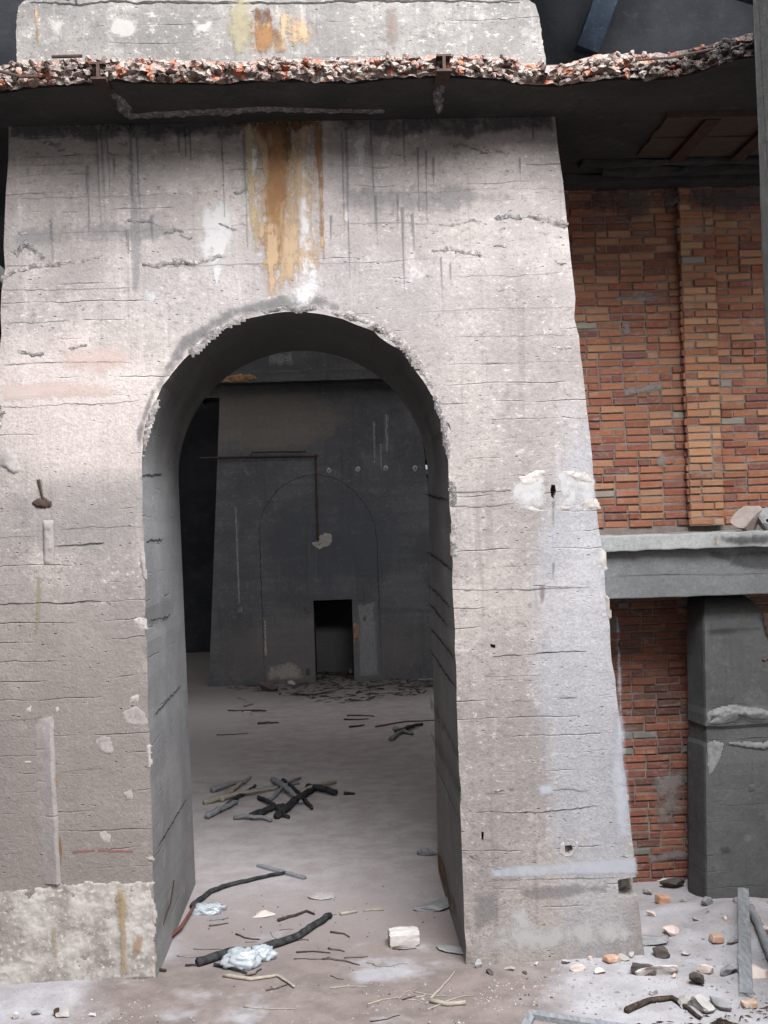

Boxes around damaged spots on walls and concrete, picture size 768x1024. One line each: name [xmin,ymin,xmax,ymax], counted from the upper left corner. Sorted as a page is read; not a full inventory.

rust [230,1,311,52]
spalling [0,33,755,91]
rust [237,120,324,295]
spalling [189,304,451,459]
spalling [142,400,160,456]
spalling [448,481,457,507]
spalling [513,470,601,513]
peeling [312,533,332,549]
spalling [450,523,458,557]
peeling [707,740,768,774]
spalling [559,841,579,857]